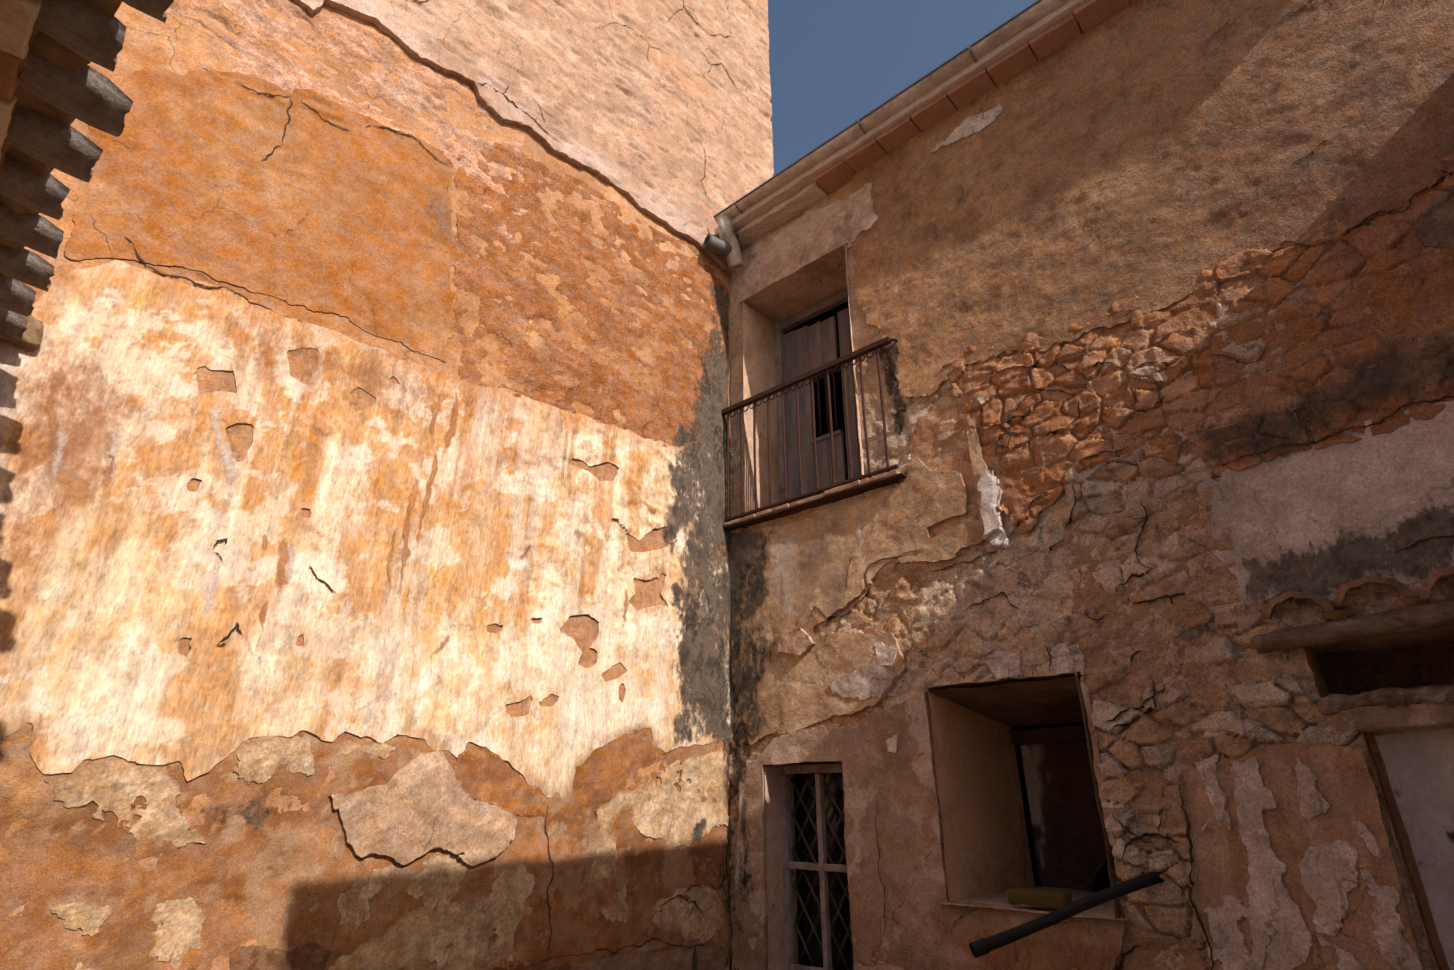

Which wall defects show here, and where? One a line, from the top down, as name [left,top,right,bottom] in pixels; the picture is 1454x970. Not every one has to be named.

crack [238,82,448,166]
crack [123,236,272,310]
spalling [165,0,730,443]
peeling [742,183,878,298]
damp [664,282,848,931]
peeling [829,642,905,701]
crack [796,358,1169,630]
crack [1085,500,1186,623]
spalling [908,153,1454,970]
damp [1175,505,1454,640]
spalling [0,722,732,970]
crack [1112,778,1214,970]